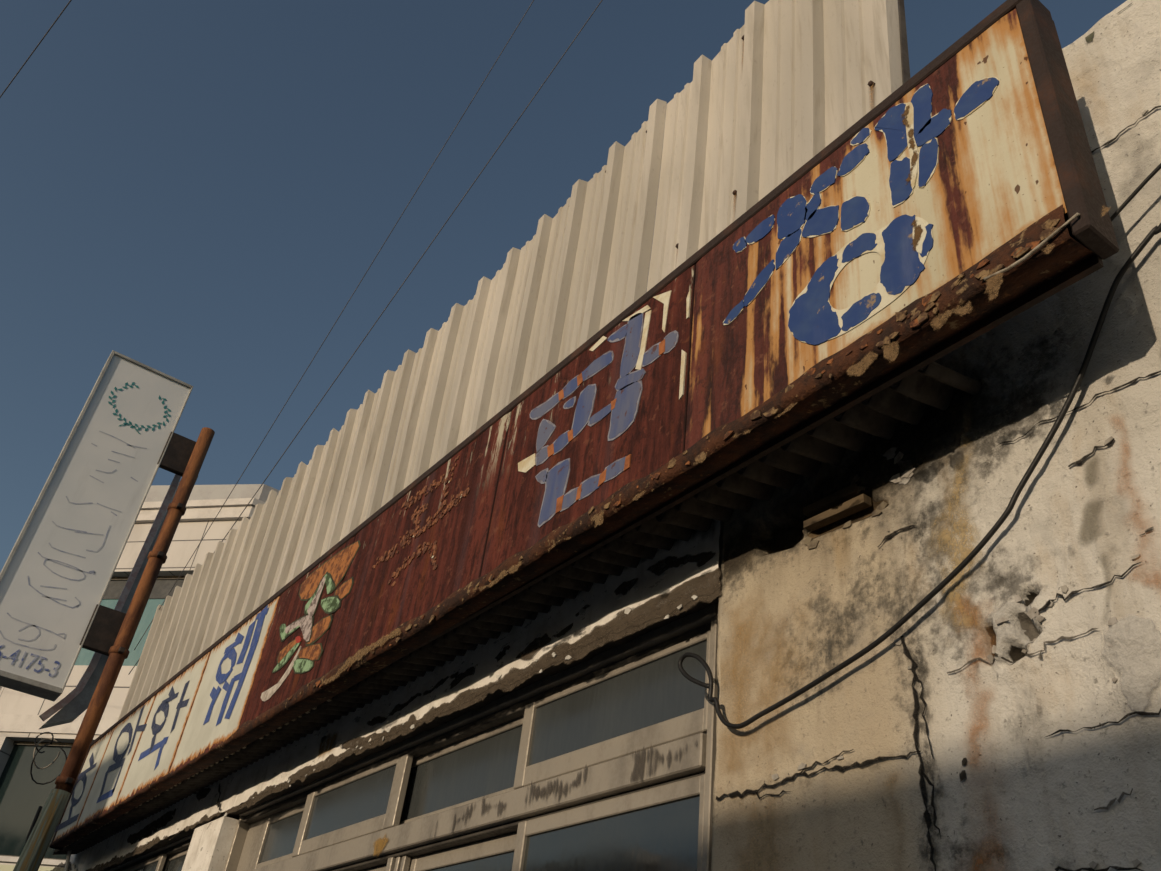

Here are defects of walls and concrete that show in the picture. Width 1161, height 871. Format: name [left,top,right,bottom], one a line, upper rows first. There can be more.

crack [998,370,1161,445]
flaking render [883,447,916,484]
crack [1068,436,1115,467]
flaking render [938,465,1045,665]
crack [1035,554,1141,613]
peeling [50,551,721,871]
crack [716,628,1098,871]
crack [1046,709,1161,737]
crack [1094,788,1133,810]
crack [1055,859,1144,871]